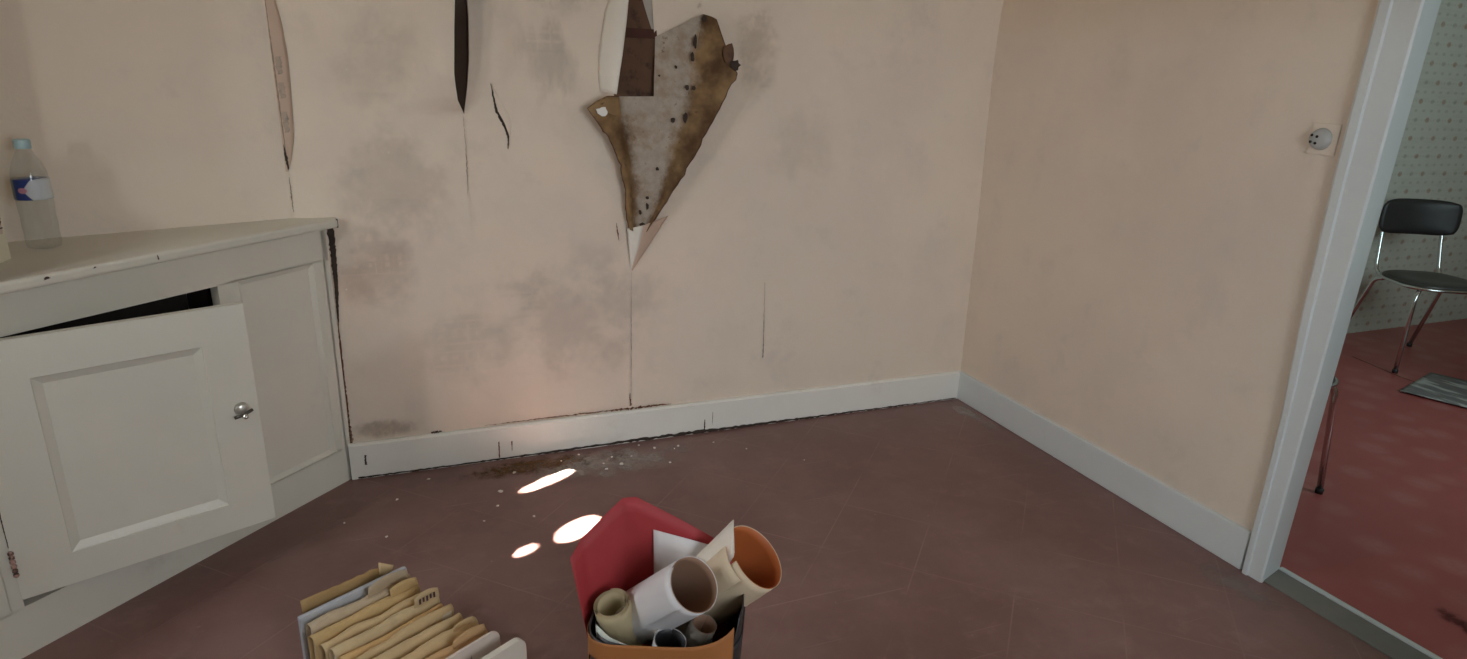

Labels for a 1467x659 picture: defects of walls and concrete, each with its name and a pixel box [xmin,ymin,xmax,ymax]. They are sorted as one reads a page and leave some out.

flaking render [643,0,654,29]
damp [658,15,707,77]
damp [723,43,741,71]
crack [265,1,294,212]
crack [327,228,955,479]